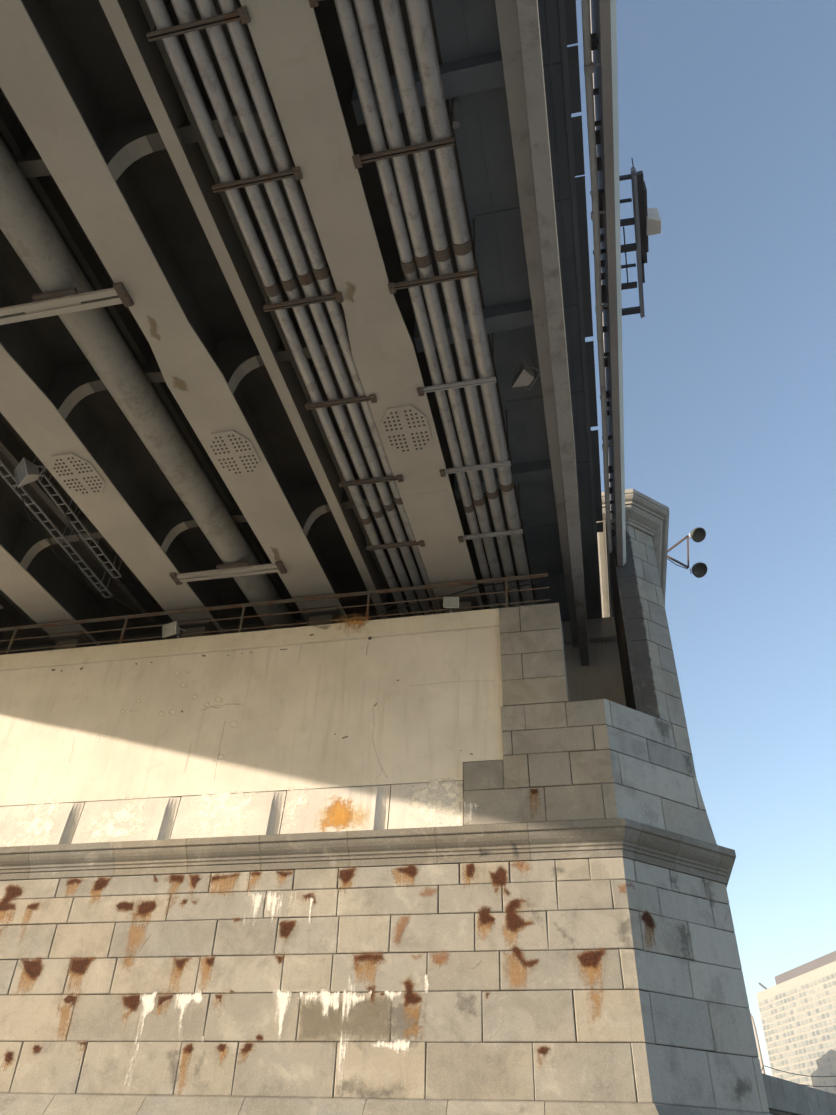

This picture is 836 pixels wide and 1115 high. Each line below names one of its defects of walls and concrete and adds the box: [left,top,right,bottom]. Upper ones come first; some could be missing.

rust [321,798,358,830]
rust [0,885,39,932]
rust [117,901,156,966]
rust [154,872,261,904]
rust [465,864,475,881]
rust [478,862,538,984]
rust [19,958,42,988]
rust [61,958,95,1036]
efflorescence [136,992,157,1050]
efflorescence [175,992,202,1032]
leakage [276,979,410,1072]
rust [577,949,605,1009]